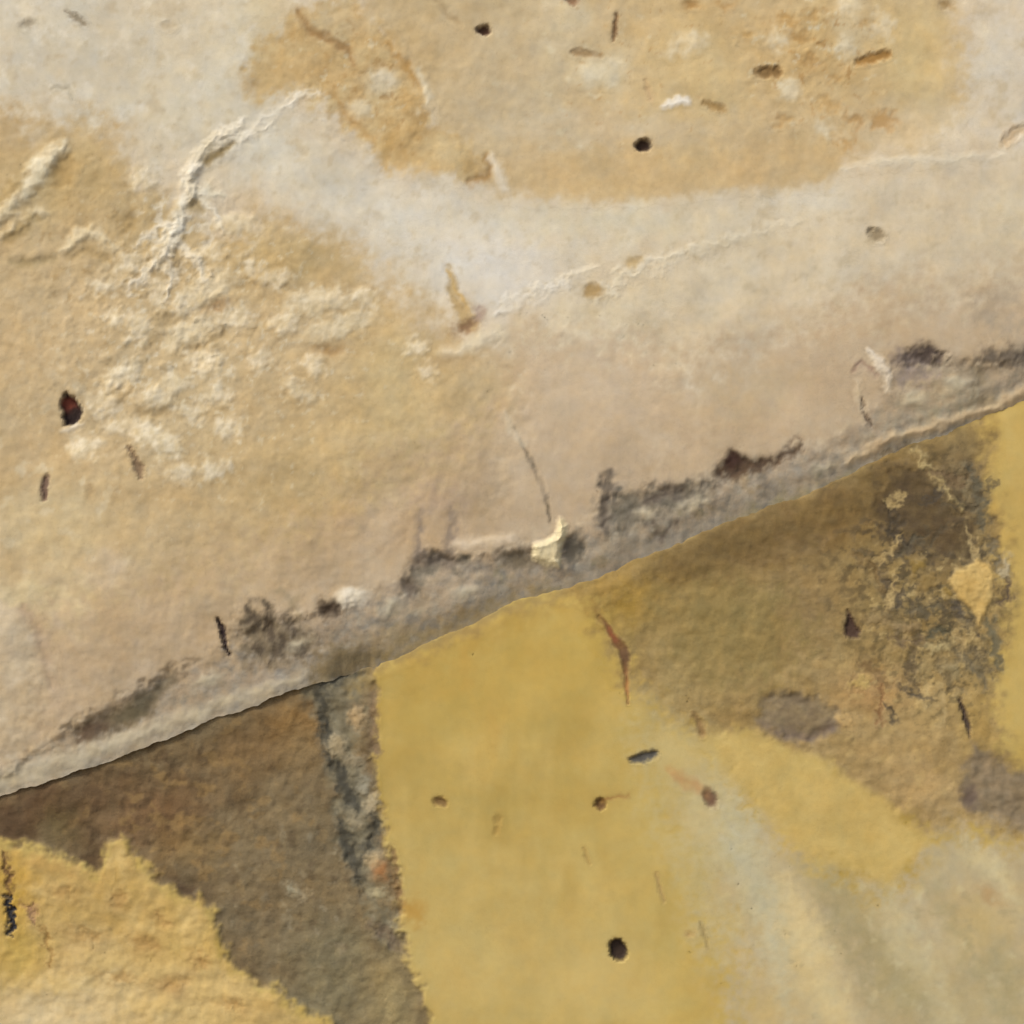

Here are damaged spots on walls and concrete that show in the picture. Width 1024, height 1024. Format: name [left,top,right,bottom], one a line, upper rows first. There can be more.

peeling [626,488,717,527]
peeling [281,633,319,657]
peeling [328,583,409,622]
peeling [441,580,488,606]
damp [0,219,1024,1024]
peeling [578,558,669,694]
peeling [666,411,1024,832]
peeling [0,676,438,1024]